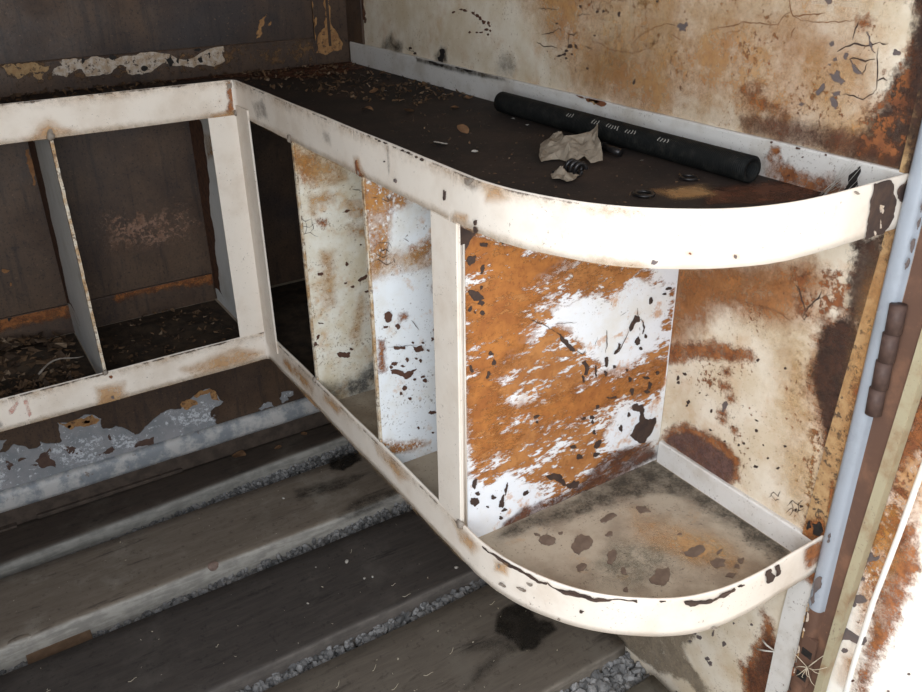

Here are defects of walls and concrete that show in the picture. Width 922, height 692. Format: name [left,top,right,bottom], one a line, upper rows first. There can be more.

peeling [2,46,225,80]
peeling [312,0,343,55]
rust [539,0,922,194]
rust [662,234,890,540]
peeling [0,388,223,491]
rust [851,396,922,692]
water stain [491,603,554,651]